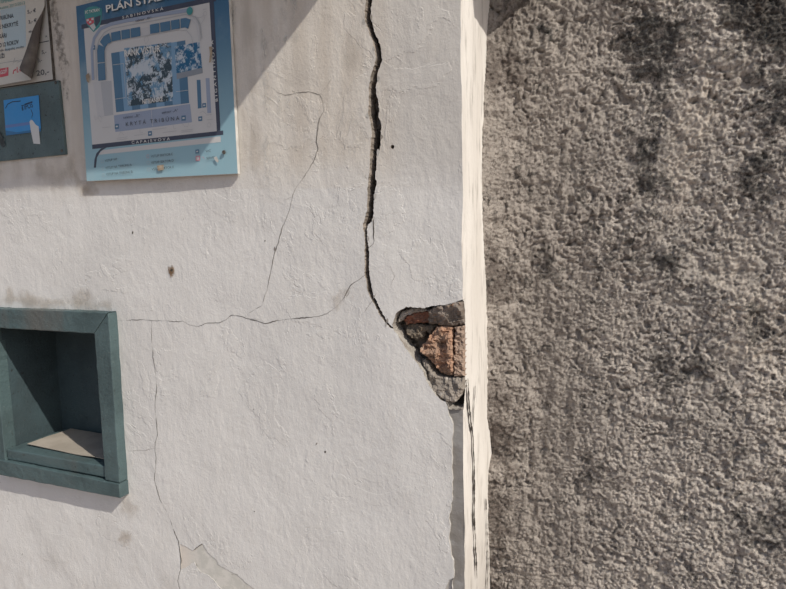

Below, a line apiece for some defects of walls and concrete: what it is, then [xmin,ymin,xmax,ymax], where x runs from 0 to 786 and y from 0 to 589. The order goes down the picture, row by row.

crack [118,0,398,400]
water stain [654,246,684,286]
water stain [619,0,786,217]
water stain [710,235,780,360]
flaking render [392,299,468,589]
peeling [180,544,253,589]